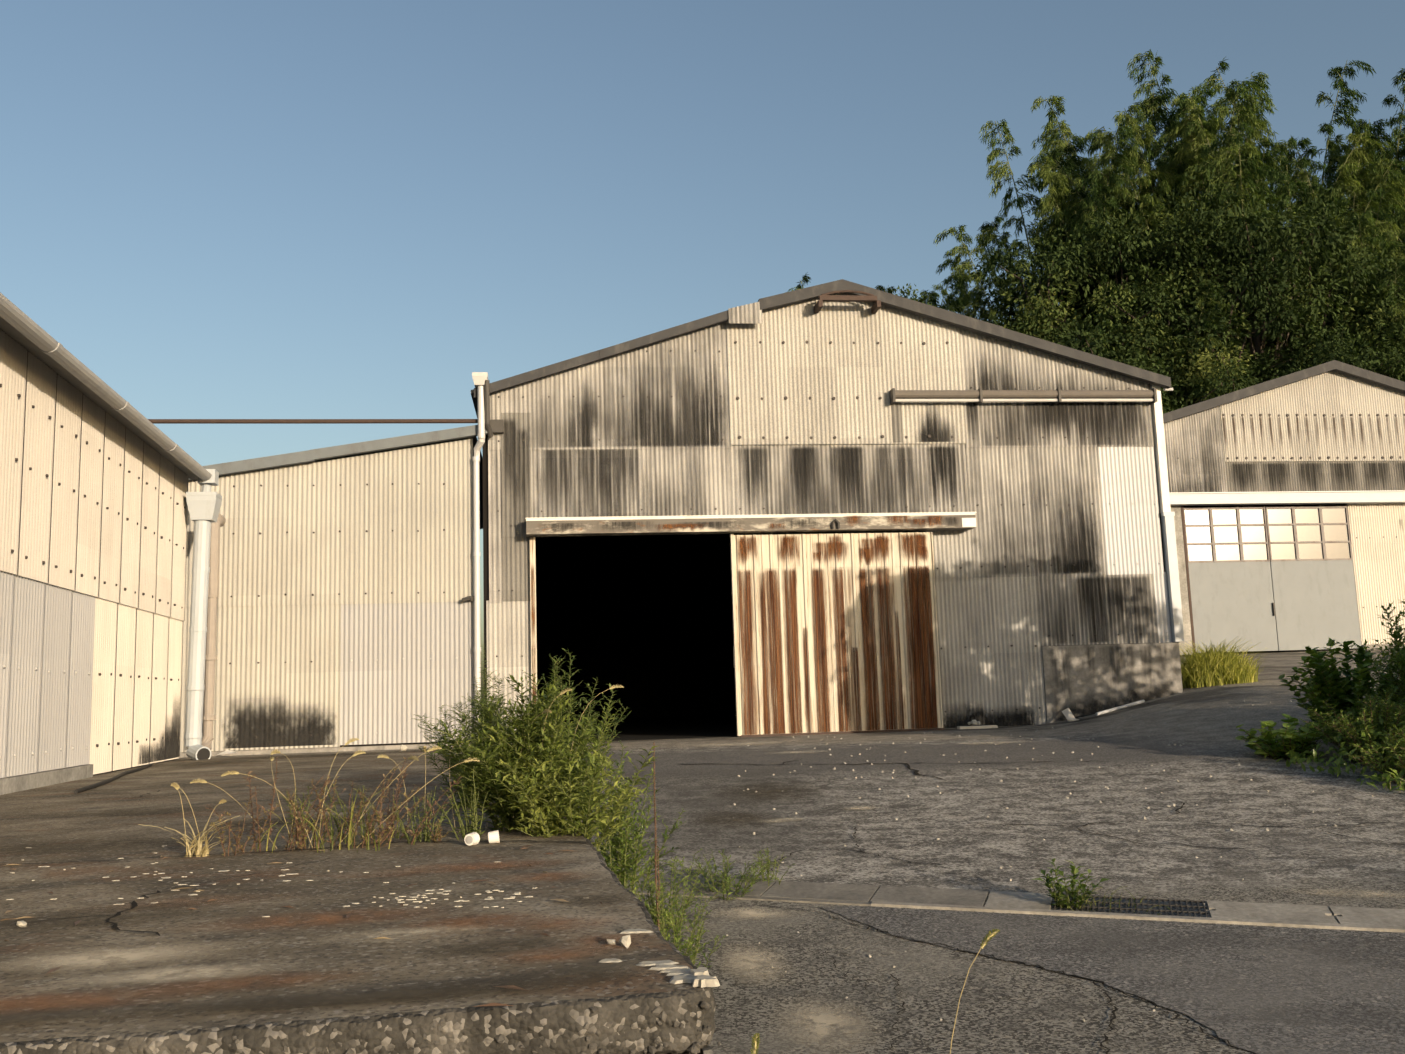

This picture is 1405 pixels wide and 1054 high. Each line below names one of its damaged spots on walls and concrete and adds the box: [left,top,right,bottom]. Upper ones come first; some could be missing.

water stain [543,383,722,530]
water stain [744,449,763,497]
water stain [791,419,956,527]
water stain [1030,386,1139,444]
water stain [1232,463,1405,488]
water stain [1041,501,1148,642]
corrosion [739,516,941,735]
water stain [139,709,342,765]
crack [3,840,603,936]
crack [771,826,939,871]
spalling [567,958,720,1054]
crack [715,905,1237,1054]